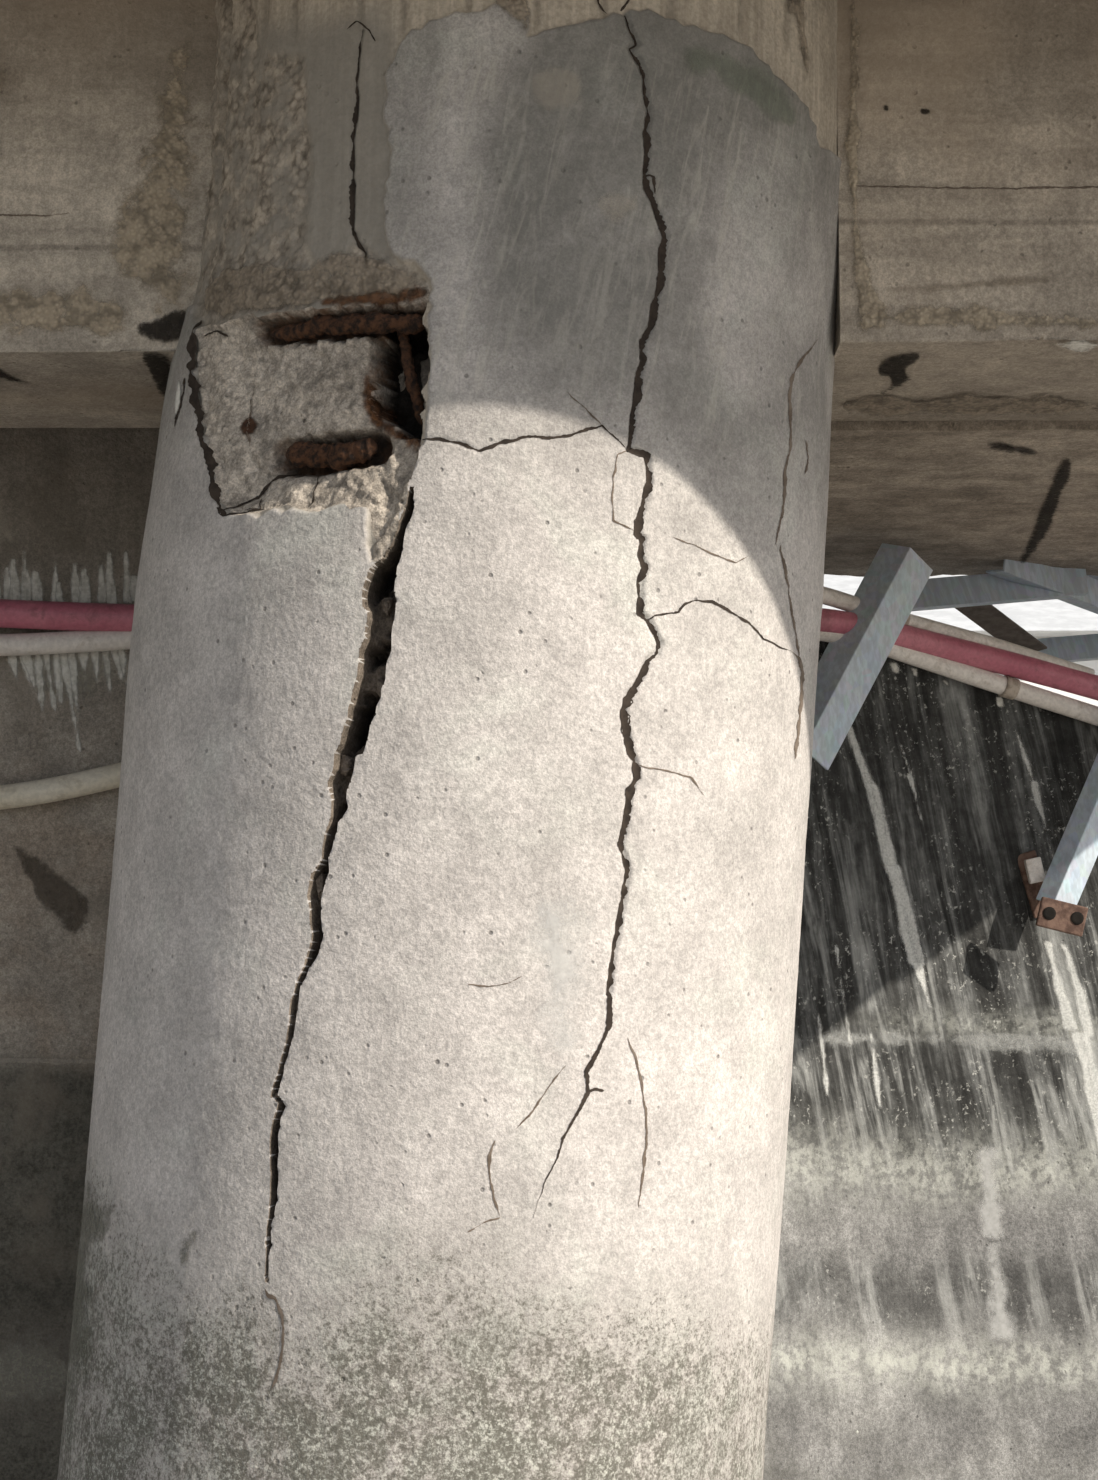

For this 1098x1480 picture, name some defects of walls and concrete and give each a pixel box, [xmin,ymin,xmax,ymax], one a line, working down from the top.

crack [347,21,375,258]
corrosion [322,288,426,307]
spalling [138,252,431,565]
corrosion [364,376,418,444]
damp [8,650,126,751]
damp [0,552,137,604]
crack [423,0,816,1232]
damp [16,849,87,932]
crack [264,487,415,1390]
damp [848,728,926,991]
damp [871,1037,880,1105]
damp [1045,942,1098,1141]